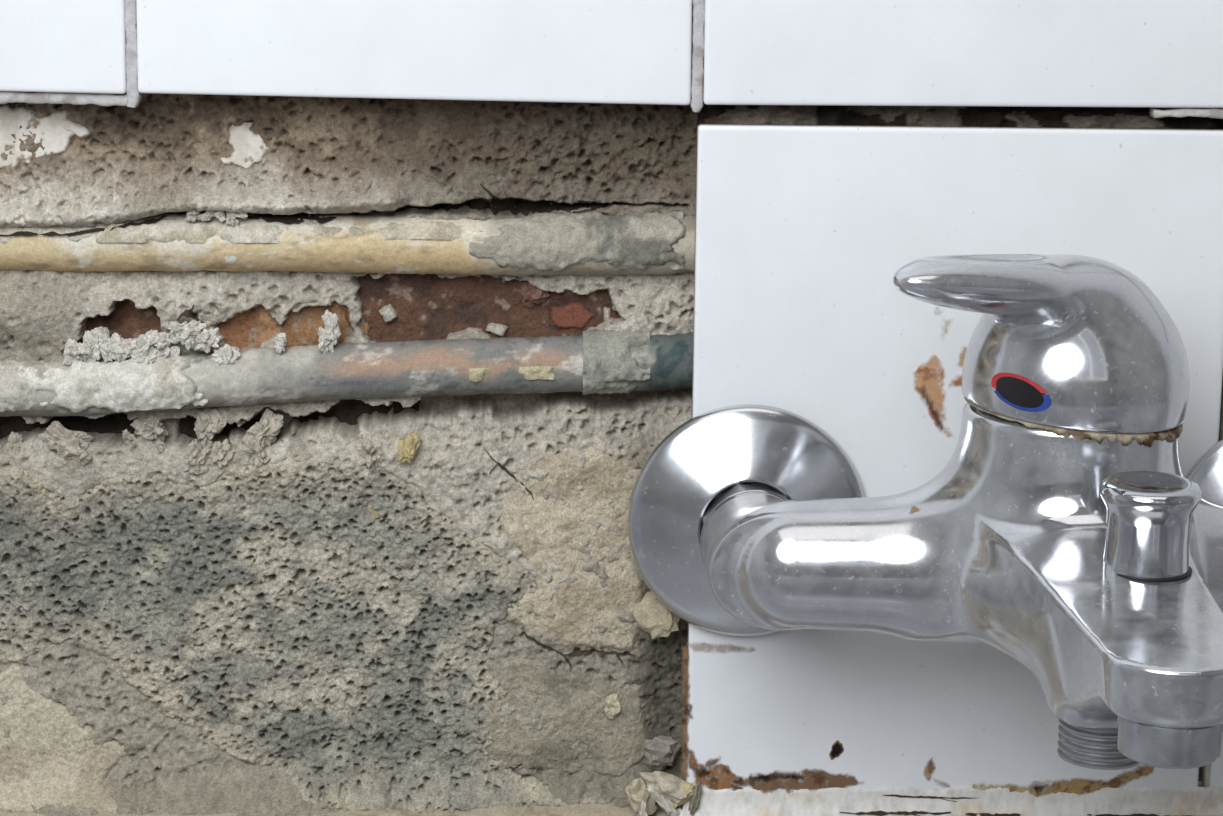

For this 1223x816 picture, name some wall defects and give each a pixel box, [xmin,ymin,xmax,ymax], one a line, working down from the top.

peeling [0,102,90,168]
peeling [220,122,269,169]
crack [0,184,671,237]
flaking render [77,299,162,347]
flaking render [217,273,621,349]
corrosion [915,348,967,435]
spalling [0,456,606,813]
corrosion [924,760,935,780]
corrosion [973,765,1154,797]